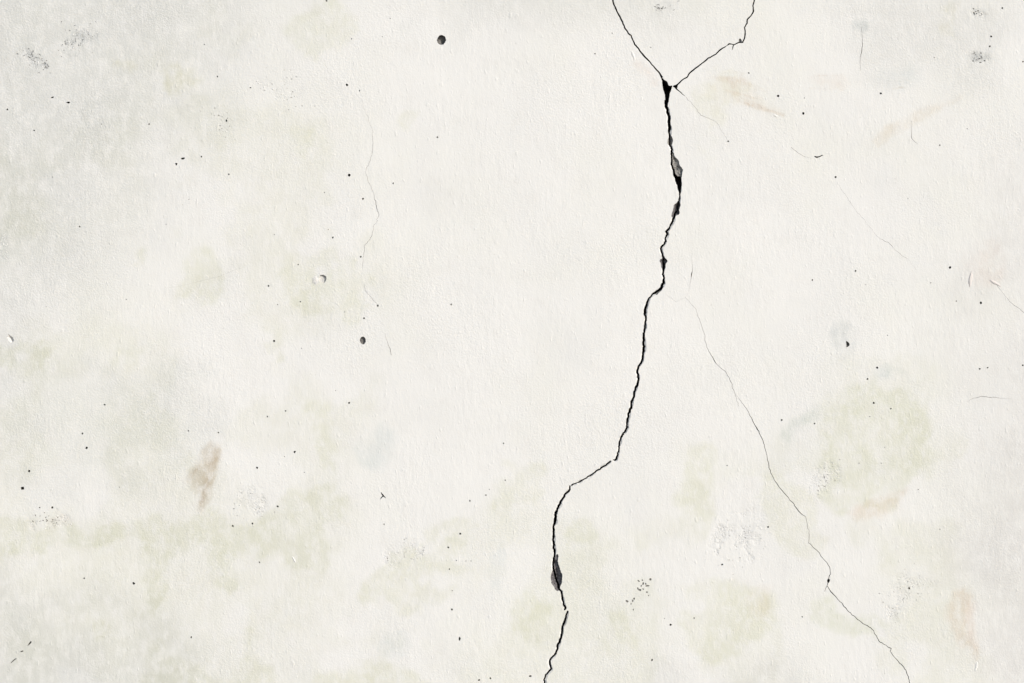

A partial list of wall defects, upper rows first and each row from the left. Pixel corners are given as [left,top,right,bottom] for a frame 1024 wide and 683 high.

crack [543,0,910,683]